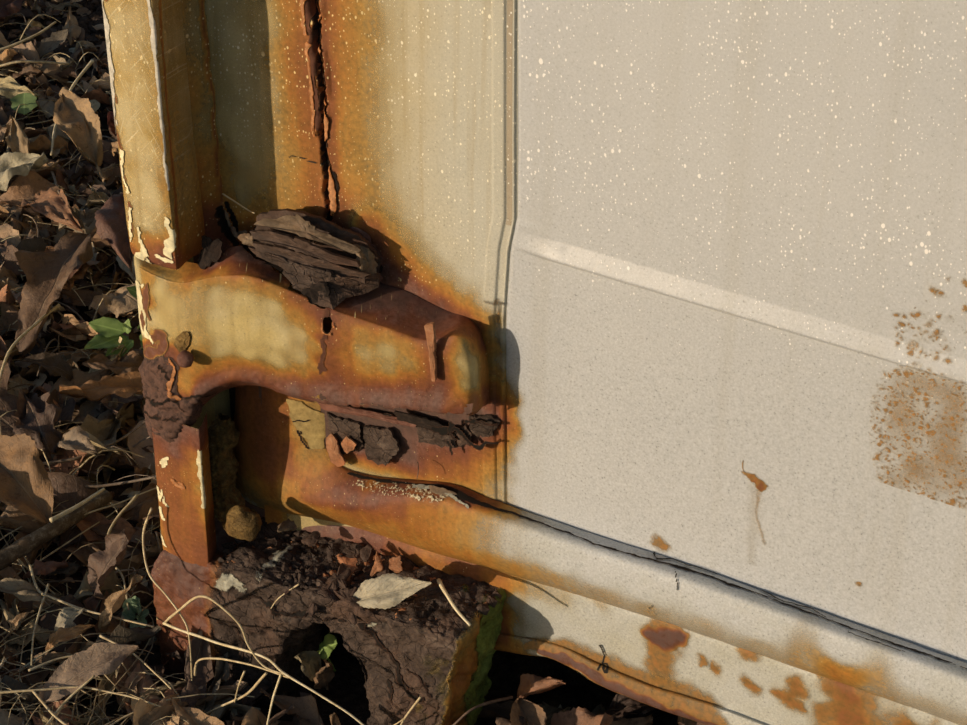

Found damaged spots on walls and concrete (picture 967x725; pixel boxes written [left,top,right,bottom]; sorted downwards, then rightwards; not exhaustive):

crack [289,0,339,221]
peeling [119,149,130,194]
peeling [128,207,176,264]
peeling [135,280,168,359]
corrosion [115,0,727,725]
peeling [286,399,326,450]
corrosion [873,307,967,508]
corrosion [742,461,767,492]
crack [347,472,967,669]
corrosion [737,643,917,725]